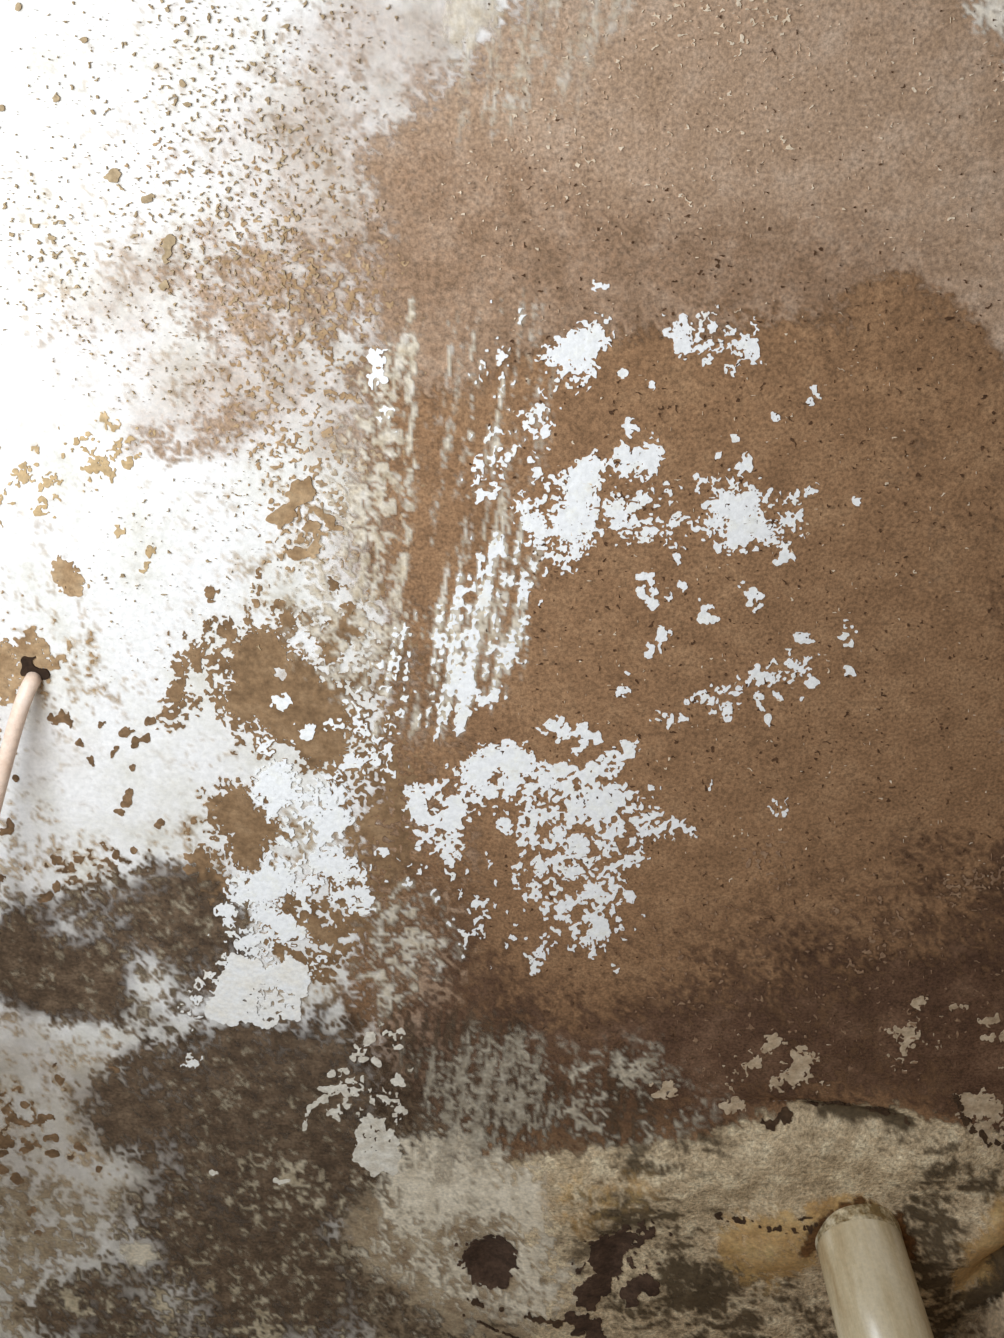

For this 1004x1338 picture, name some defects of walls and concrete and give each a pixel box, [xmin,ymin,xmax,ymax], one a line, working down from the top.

peeling [0,411,156,519]
water stain [142,398,255,461]
peeling [50,555,90,597]
peeling [0,612,105,706]
peeling [98,305,822,1031]
peeling [47,709,95,767]
peeling [37,841,150,904]
water stain [0,856,250,1028]
water stain [622,1147,677,1178]
water stain [16,1242,186,1338]
water stain [568,1189,838,1338]
water stain [901,1143,1004,1338]